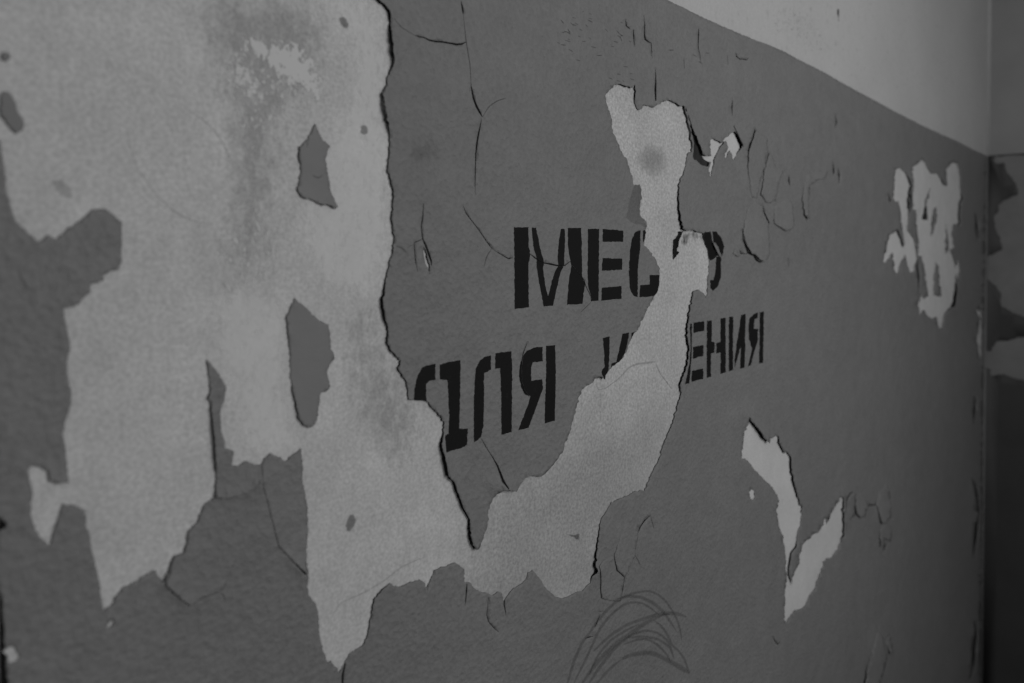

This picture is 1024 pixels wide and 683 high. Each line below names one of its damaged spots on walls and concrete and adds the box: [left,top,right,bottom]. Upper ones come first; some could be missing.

crack [415,35,466,45]
crack [471,87,482,171]
crack [414,203,432,267]
peeling [883,160,961,328]
peeling [0,0,739,683]
peeling [742,422,843,621]